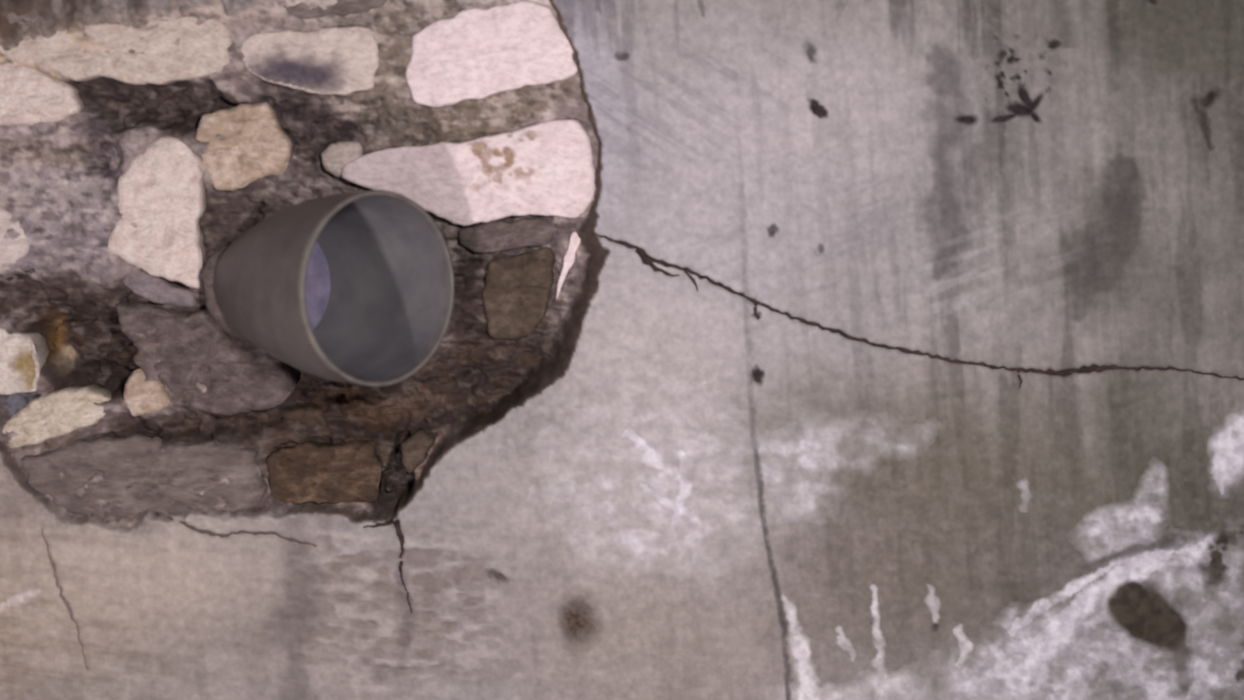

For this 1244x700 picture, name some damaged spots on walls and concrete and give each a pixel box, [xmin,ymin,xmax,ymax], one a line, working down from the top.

spalling [0,0,612,537]
crack [586,232,1244,389]
crack [363,510,412,613]
leakage [762,408,1244,700]